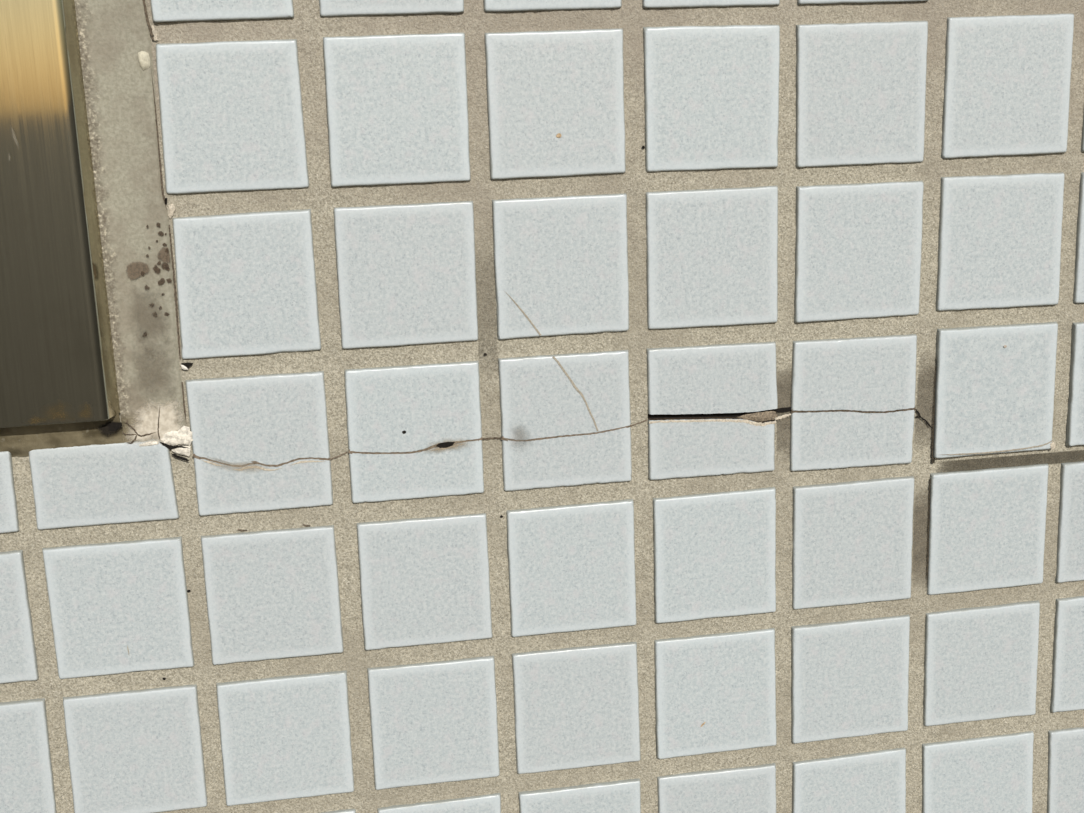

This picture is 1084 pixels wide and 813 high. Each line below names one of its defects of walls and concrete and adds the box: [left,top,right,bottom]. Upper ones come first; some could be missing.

peeling [139,426,193,456]
crack [192,296,1055,581]